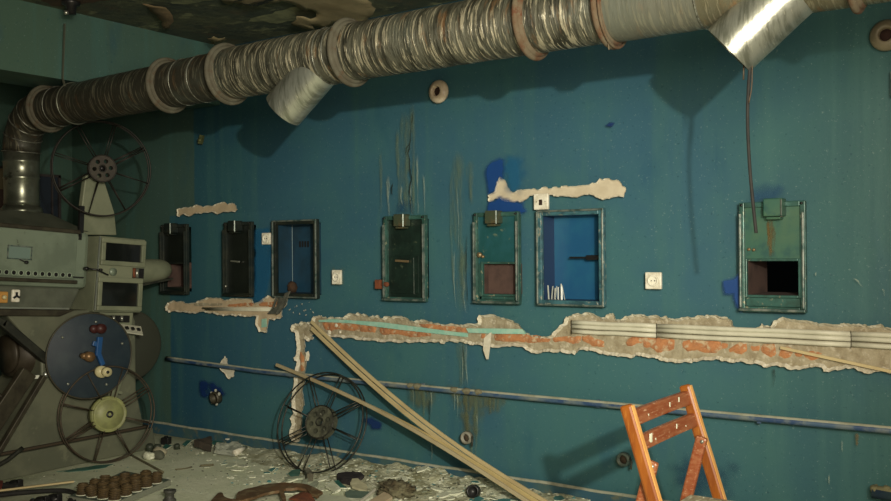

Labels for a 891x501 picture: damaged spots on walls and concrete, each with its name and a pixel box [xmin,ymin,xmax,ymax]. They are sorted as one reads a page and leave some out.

peeling [222,0,376,30]
crack [391,114,413,211]
flaking render [488,177,626,202]
flaking render [177,202,238,217]
flaking render [165,291,891,442]